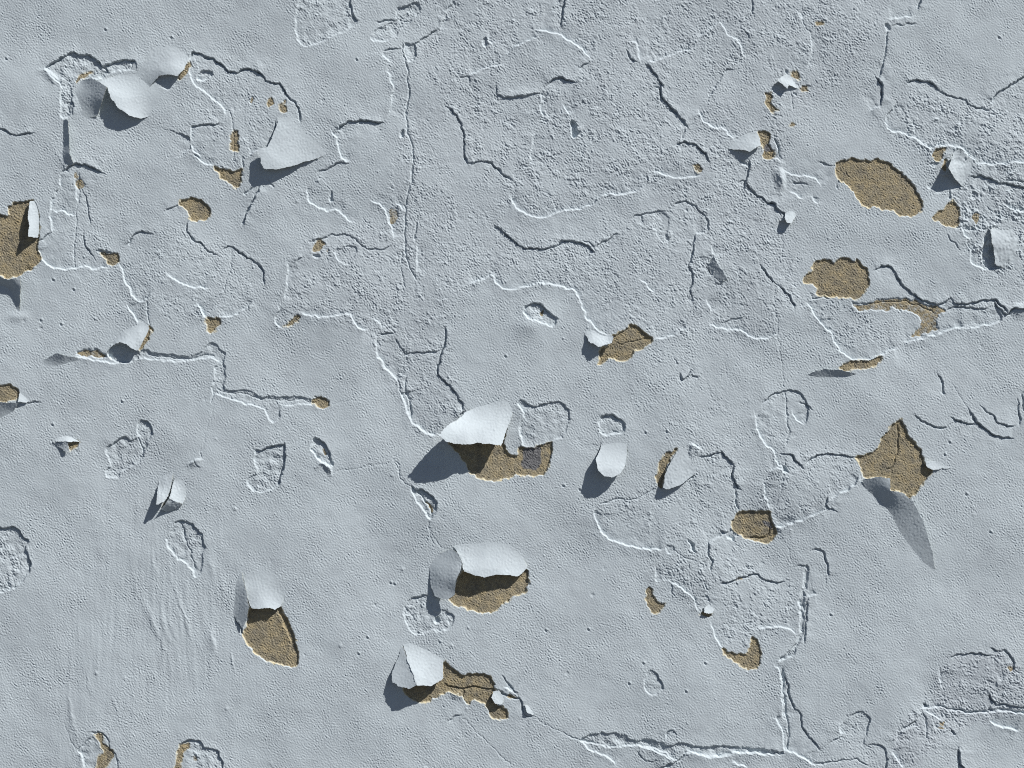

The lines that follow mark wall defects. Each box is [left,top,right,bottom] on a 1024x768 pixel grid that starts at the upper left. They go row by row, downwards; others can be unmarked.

crack [869,0,1024,113]
peeling [0,0,422,366]
spalling [783,101,1024,273]
crack [138,341,361,466]
peeling [273,186,573,484]
crack [742,180,798,388]
spalling [704,388,953,570]
crack [849,263,1024,344]
crack [912,372,1024,443]
peeling [232,570,301,669]
peeling [310,435,584,768]
crack [560,544,870,768]